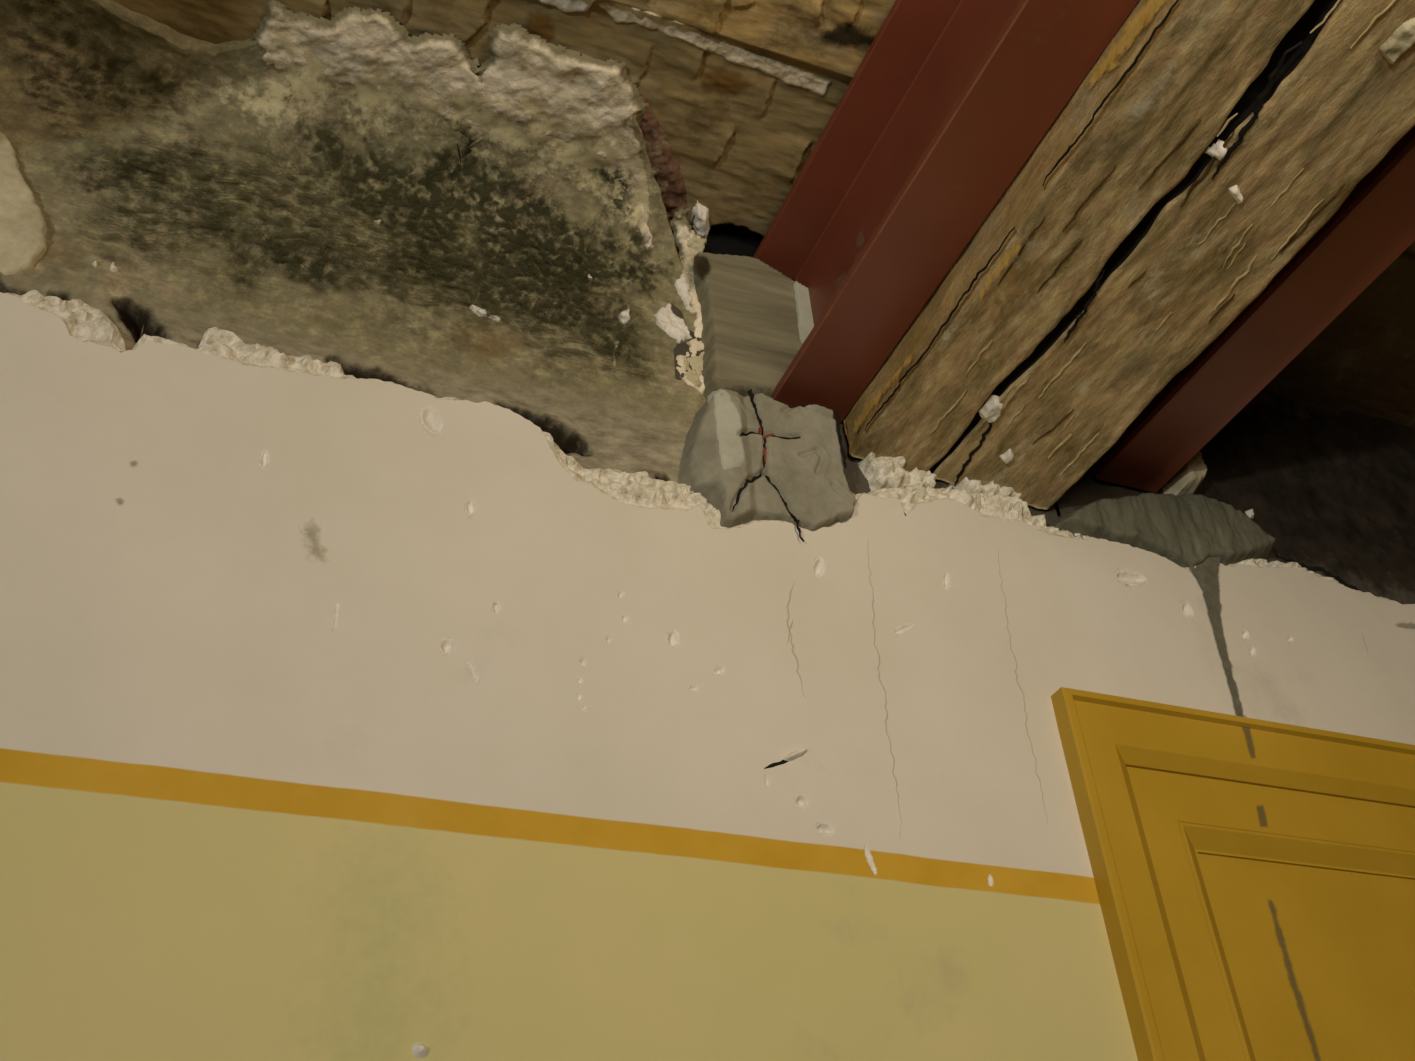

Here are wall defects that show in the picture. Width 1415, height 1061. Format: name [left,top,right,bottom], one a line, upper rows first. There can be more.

water stain [14,0,193,123]
water stain [80,118,655,375]
spalling [0,0,785,529]
crack [732,389,804,542]
crack [835,410,847,468]
spalling [830,420,1163,539]
spalling [1214,388,1347,465]
spalling [1221,523,1415,605]